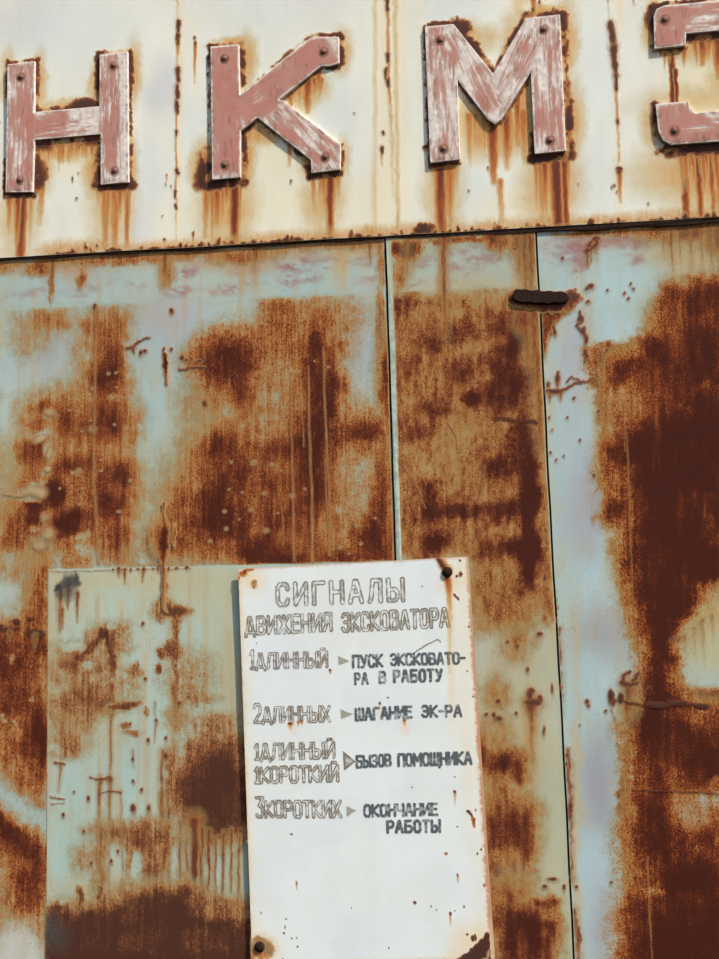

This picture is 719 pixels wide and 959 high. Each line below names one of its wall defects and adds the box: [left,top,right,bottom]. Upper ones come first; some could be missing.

peeling [7,54,120,191]
corrosion [3,48,140,137]
peeling [212,38,338,175]
corrosion [283,31,350,113]
peeling [429,0,564,160]
corrosion [423,5,582,228]
corrosion [607,19,623,200]
corrosion [644,0,719,103]
peeling [656,3,719,47]
peeling [658,103,719,143]
corrosion [0,96,583,959]
corrosion [551,99,719,959]